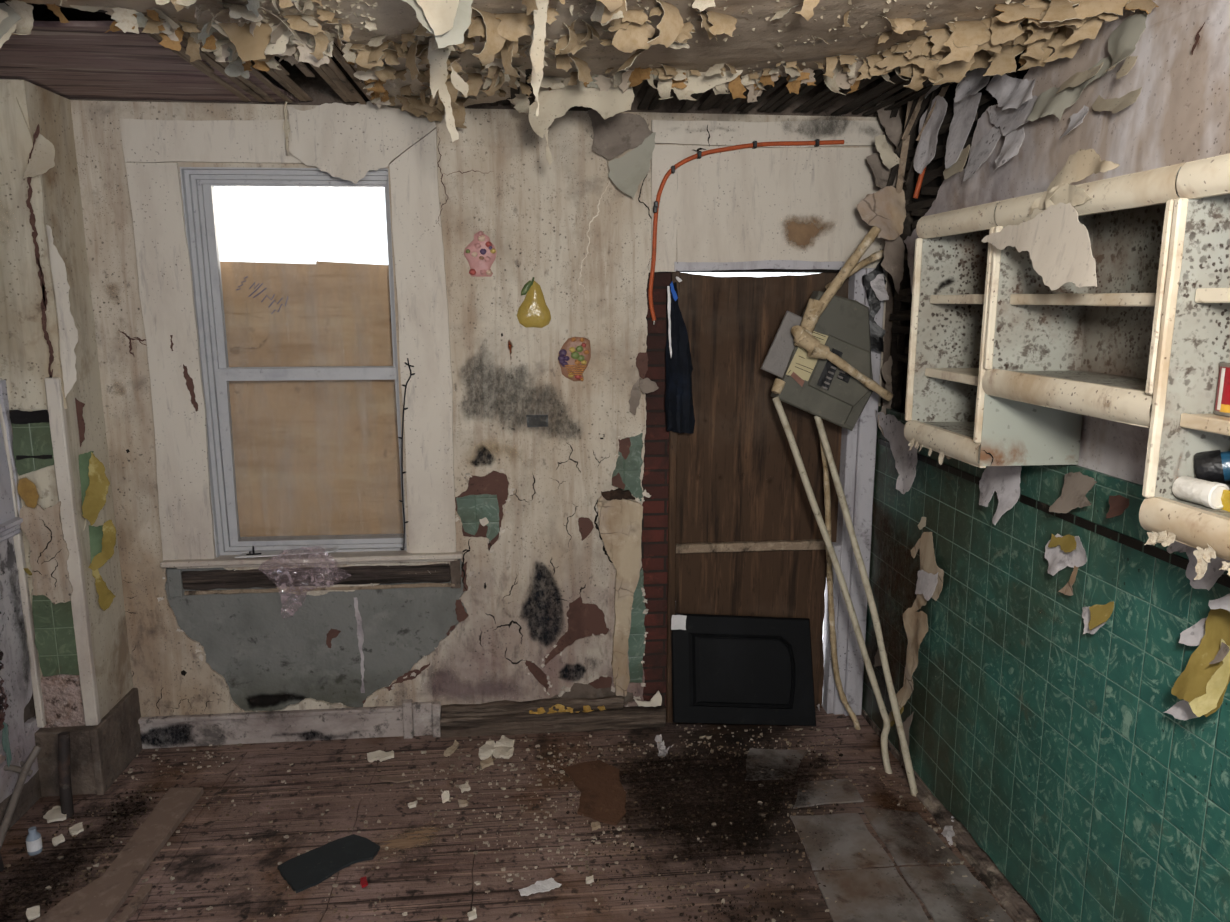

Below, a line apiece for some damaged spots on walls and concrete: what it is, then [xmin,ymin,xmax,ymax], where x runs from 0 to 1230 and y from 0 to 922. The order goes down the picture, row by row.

peeling [103,0,1159,182]
crack [26,124,54,378]
damp [785,218,830,248]
flaking render [857,186,906,442]
peeling [981,149,1119,291]
damp [462,357,580,436]
flaking render [157,559,474,712]
crack [461,539,491,591]
peeling [455,469,515,553]
crack [479,573,525,664]
damp [522,564,563,646]
crack [510,443,613,601]